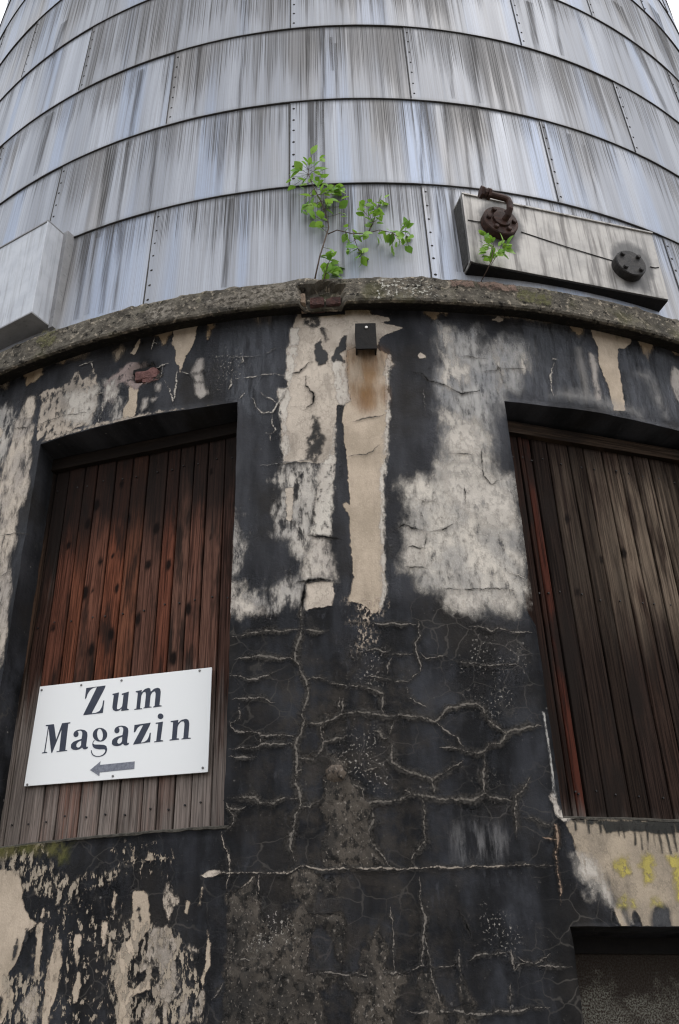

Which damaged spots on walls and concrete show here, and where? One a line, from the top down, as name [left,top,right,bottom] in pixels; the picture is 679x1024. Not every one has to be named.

peeling [0,339,183,657]
spalling [145,303,176,321]
peeling [155,324,215,369]
crack [229,349,315,438]
peeling [206,282,403,618]
peeling [399,312,532,617]
peeling [569,326,653,411]
peeling [0,842,221,1024]
spalling [221,753,409,1024]
crack [211,578,572,1019]
peeling [566,819,679,926]